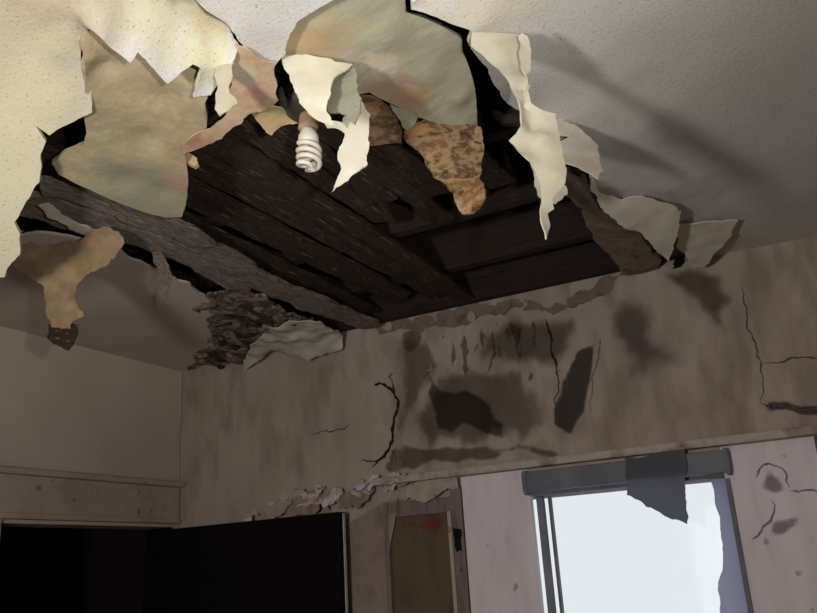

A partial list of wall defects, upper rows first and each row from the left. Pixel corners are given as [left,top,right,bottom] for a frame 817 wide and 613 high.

peeling [215,57,237,117]
peeling [282,54,371,192]
corrosion [404,119,486,215]
peeling [376,32,738,334]
peeling [243,320,343,370]
crack [742,283,817,412]
crack [362,373,400,467]
water stain [430,385,502,435]
water stain [769,402,817,414]
peeling [244,472,459,521]